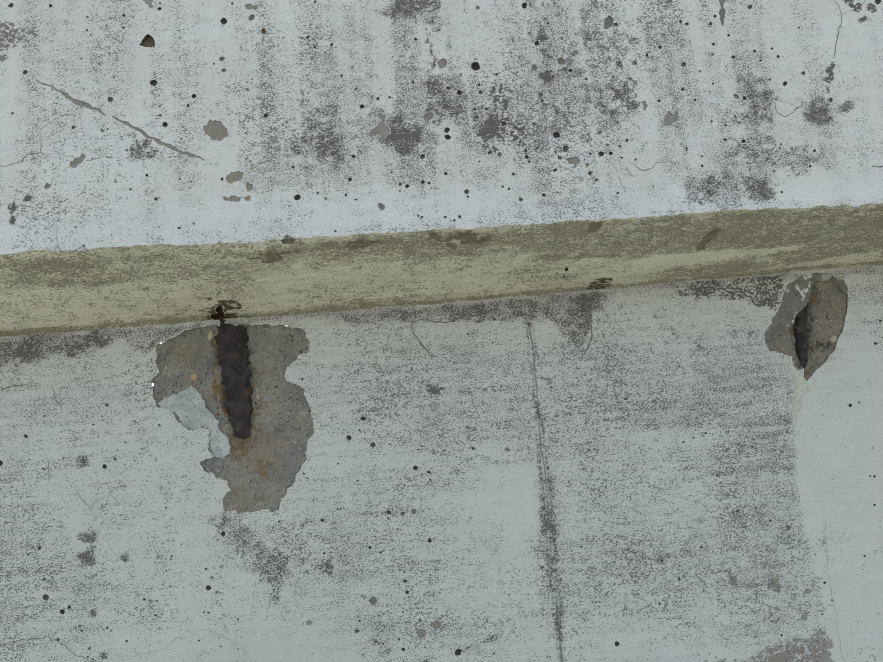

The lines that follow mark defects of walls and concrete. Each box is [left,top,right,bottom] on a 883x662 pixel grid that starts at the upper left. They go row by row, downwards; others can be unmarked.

corrosion [198,298,242,321]
spalling [764,272,848,381]
spalling [152,306,314,513]
crack [0,629,255,662]